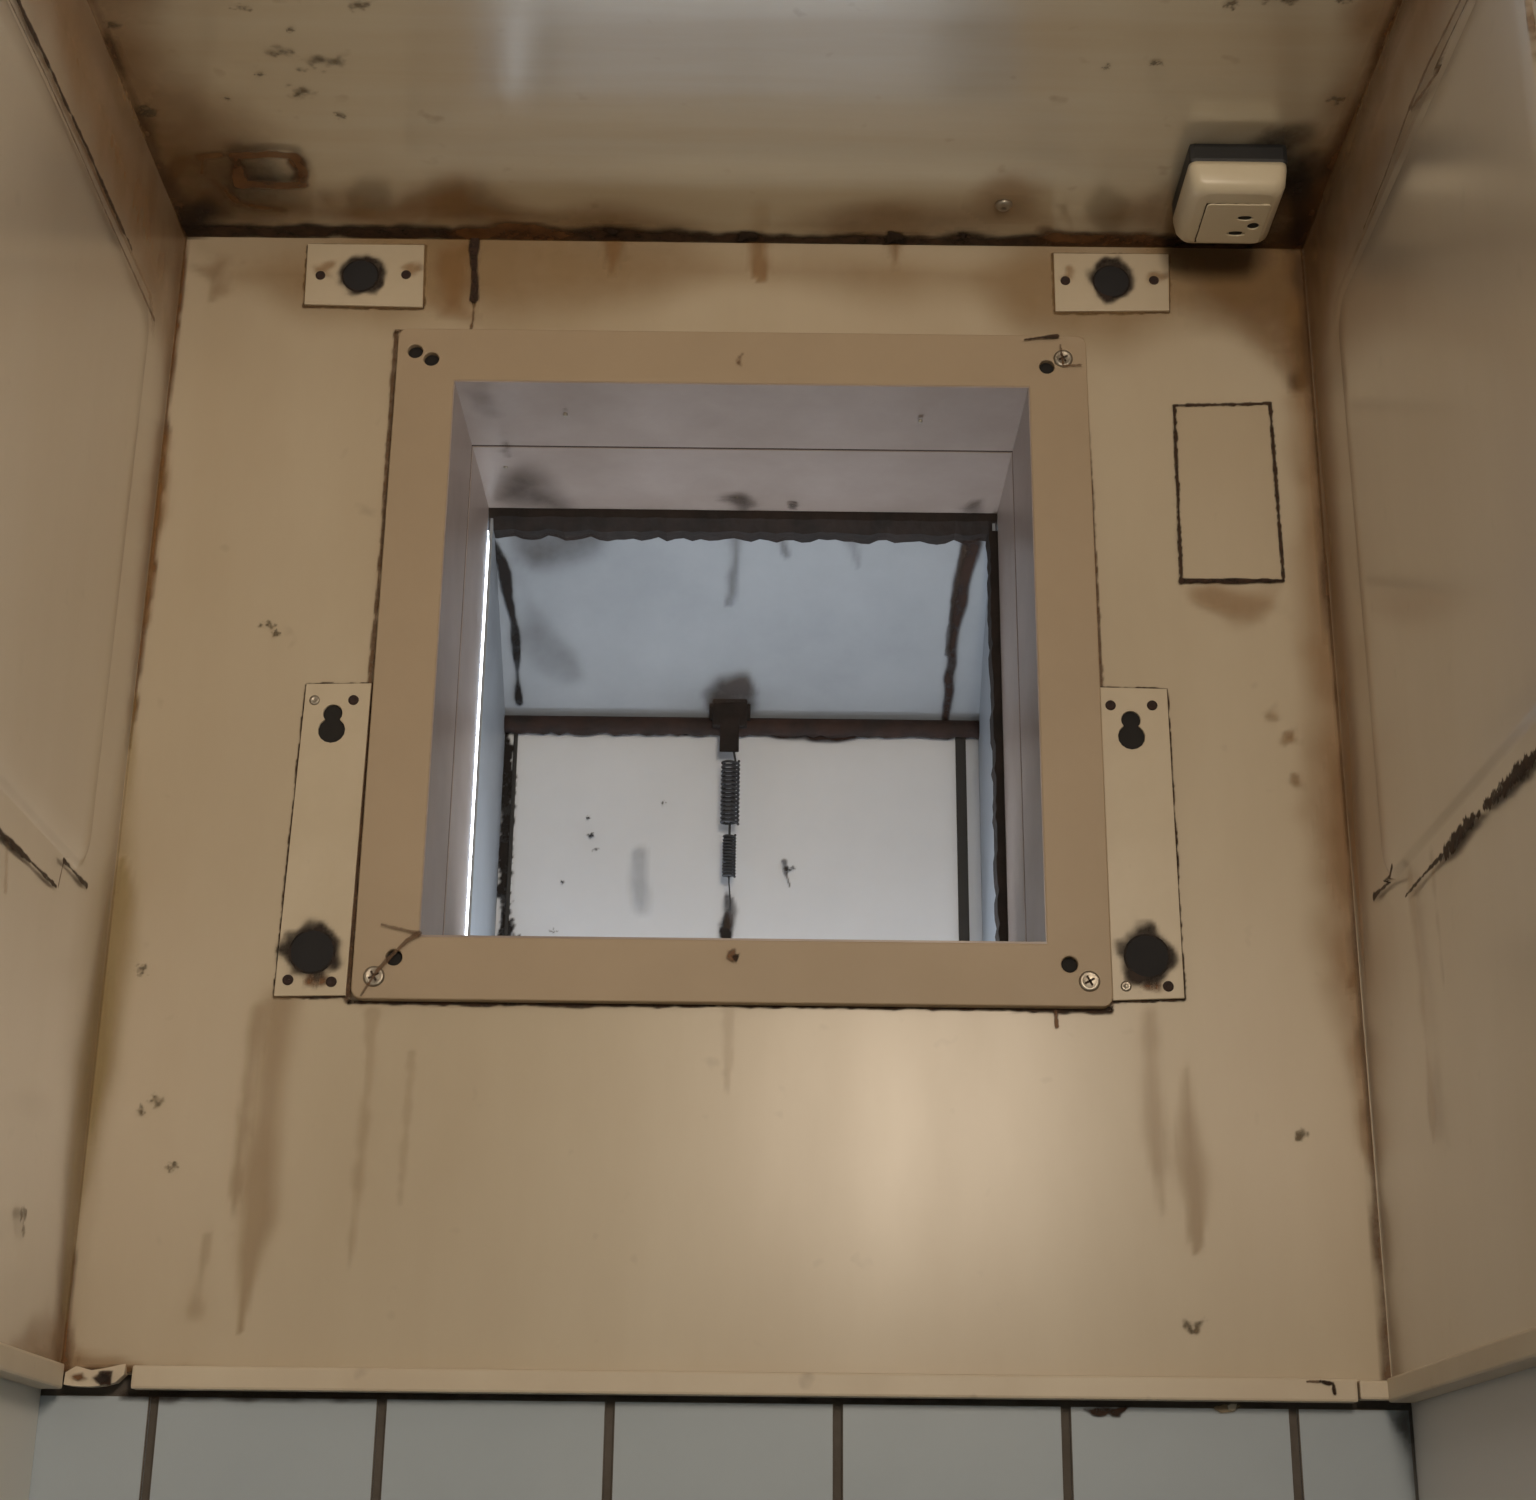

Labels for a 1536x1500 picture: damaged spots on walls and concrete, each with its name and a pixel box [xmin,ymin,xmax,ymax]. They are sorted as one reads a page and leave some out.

rust [129,0,1403,749]
rust [61,1254,133,1375]